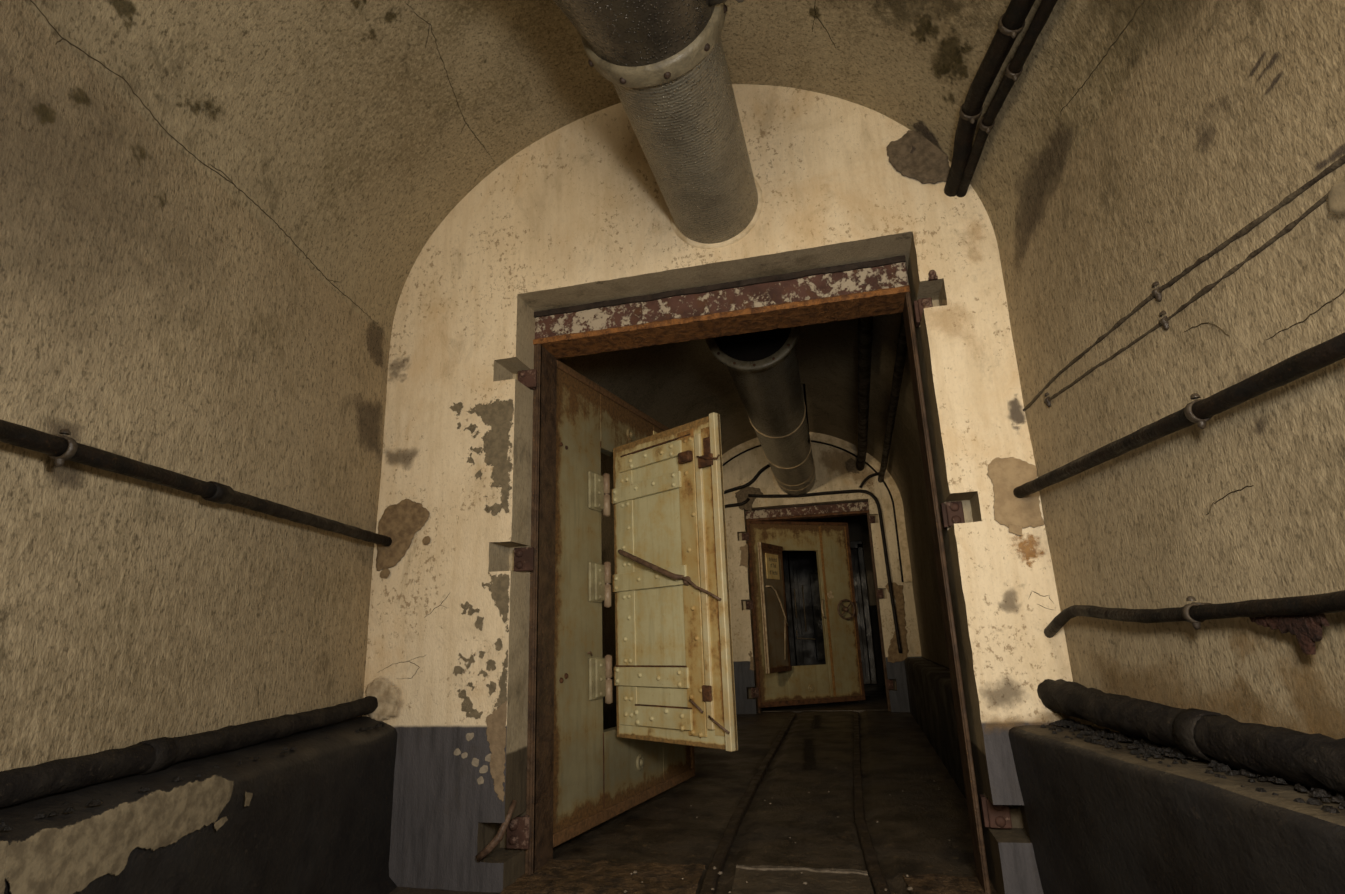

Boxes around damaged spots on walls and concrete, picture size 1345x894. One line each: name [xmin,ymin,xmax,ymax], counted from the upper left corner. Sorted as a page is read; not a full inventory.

leakage [911,14,972,102]
crack [1060,0,1145,112]
crack [30,0,375,322]
peeling [450,397,514,516]
peeling [1009,524,1023,536]
corrosion [1012,535,1045,567]
peeling [453,572,510,802]
peeling [0,774,253,894]